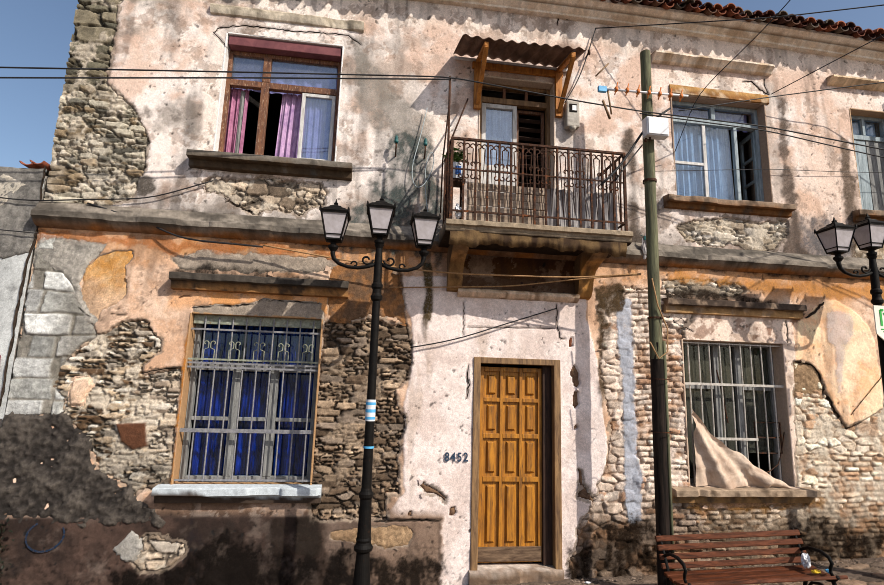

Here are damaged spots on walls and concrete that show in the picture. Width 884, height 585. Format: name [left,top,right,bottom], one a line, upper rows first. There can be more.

spalling [44,0,150,205]
spalling [195,175,327,216]
spalling [677,218,787,252]
spalling [5,232,182,494]
damp [110,517,354,585]
spalling [311,255,413,551]
damp [370,557,443,585]
damp [566,518,657,579]
spalling [568,286,657,579]
spalling [660,279,743,487]
spalling [672,359,884,571]
crack [785,302,881,430]